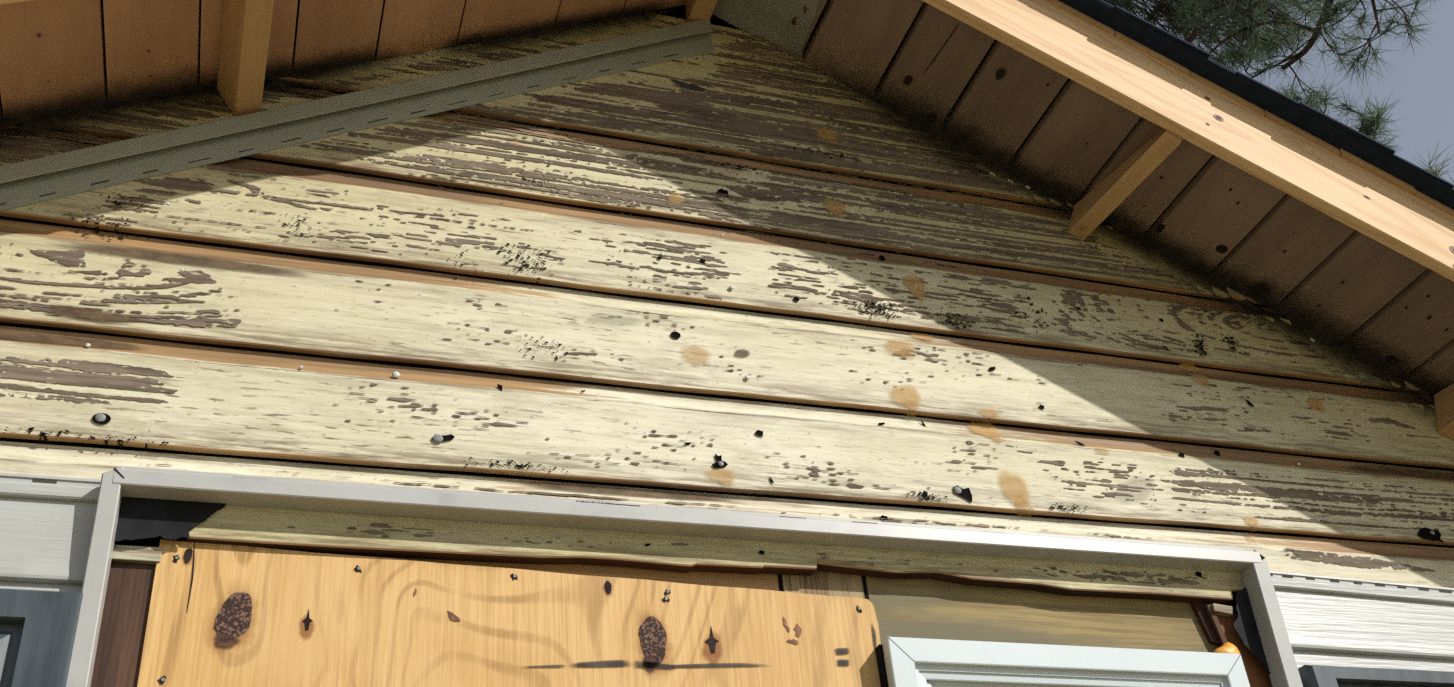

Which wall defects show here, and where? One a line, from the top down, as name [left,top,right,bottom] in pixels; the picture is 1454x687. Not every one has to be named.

peeling [0,0,1335,366]
peeling [0,357,187,403]
peeling [333,383,529,435]
peeling [546,422,716,467]
corrosion [893,387,918,406]
peeling [841,339,1044,387]
corrosion [970,424,998,436]
peeling [1161,380,1454,450]
peeling [766,452,930,492]
corrosion [1002,475,1028,504]
peeling [915,441,1454,531]
peeling [820,513,1020,528]